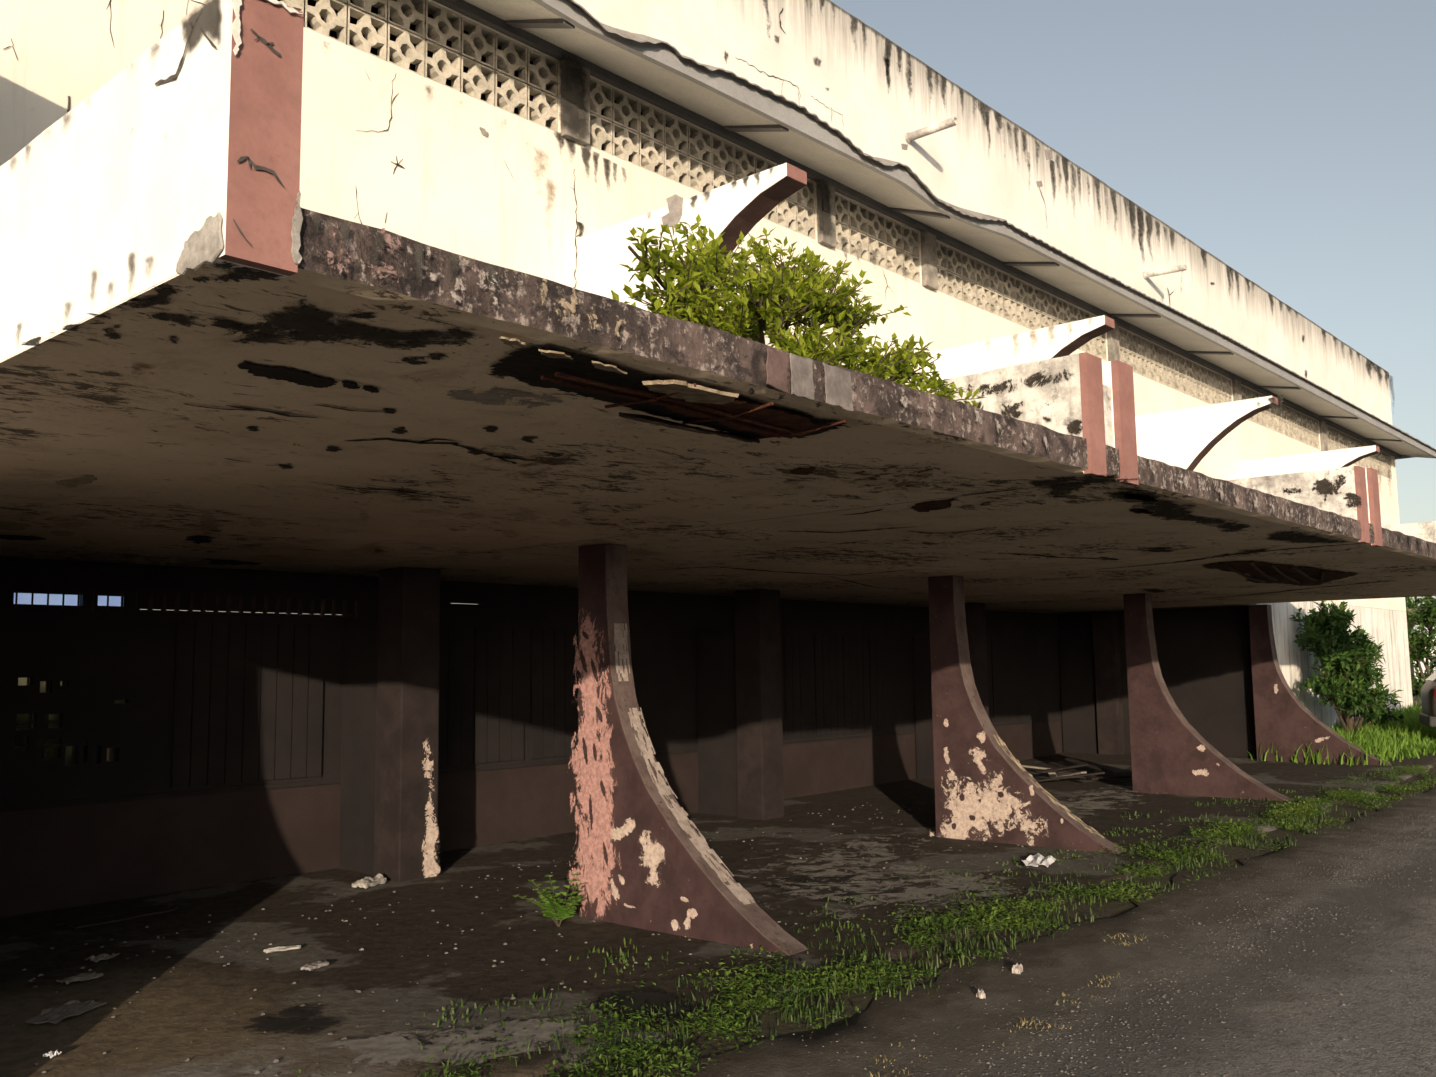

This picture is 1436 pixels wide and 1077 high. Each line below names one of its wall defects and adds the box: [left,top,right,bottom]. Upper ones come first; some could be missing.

crack [155,0,217,85]
damp [182,0,221,51]
crack [251,28,281,56]
crack [237,156,284,187]
crack [356,70,405,175]
damp [554,54,624,181]
damp [851,16,1175,254]
spalling [447,336,854,443]
damp [960,369,1083,435]
peeling [422,739,440,878]
peeling [568,608,665,919]
peeling [628,708,1166,923]